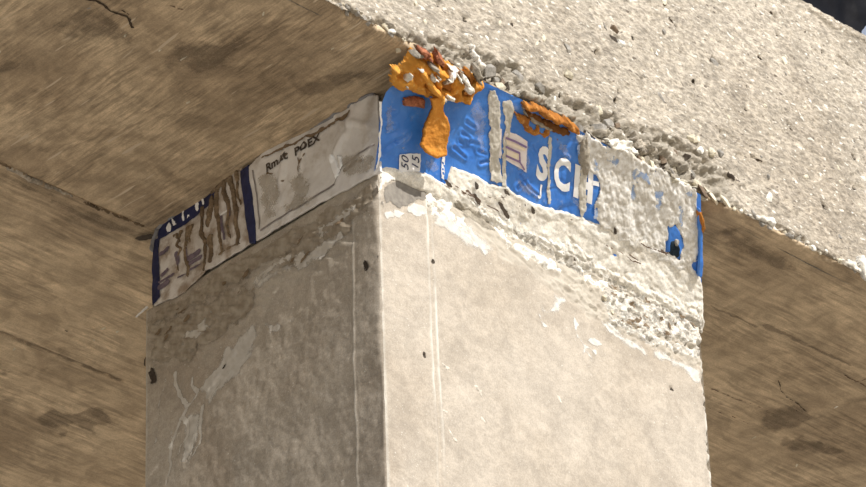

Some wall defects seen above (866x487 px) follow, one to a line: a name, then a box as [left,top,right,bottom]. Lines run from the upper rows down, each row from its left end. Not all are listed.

crack [88,0,134,28]
spalling [469,45,866,281]
spalling [144,167,702,384]